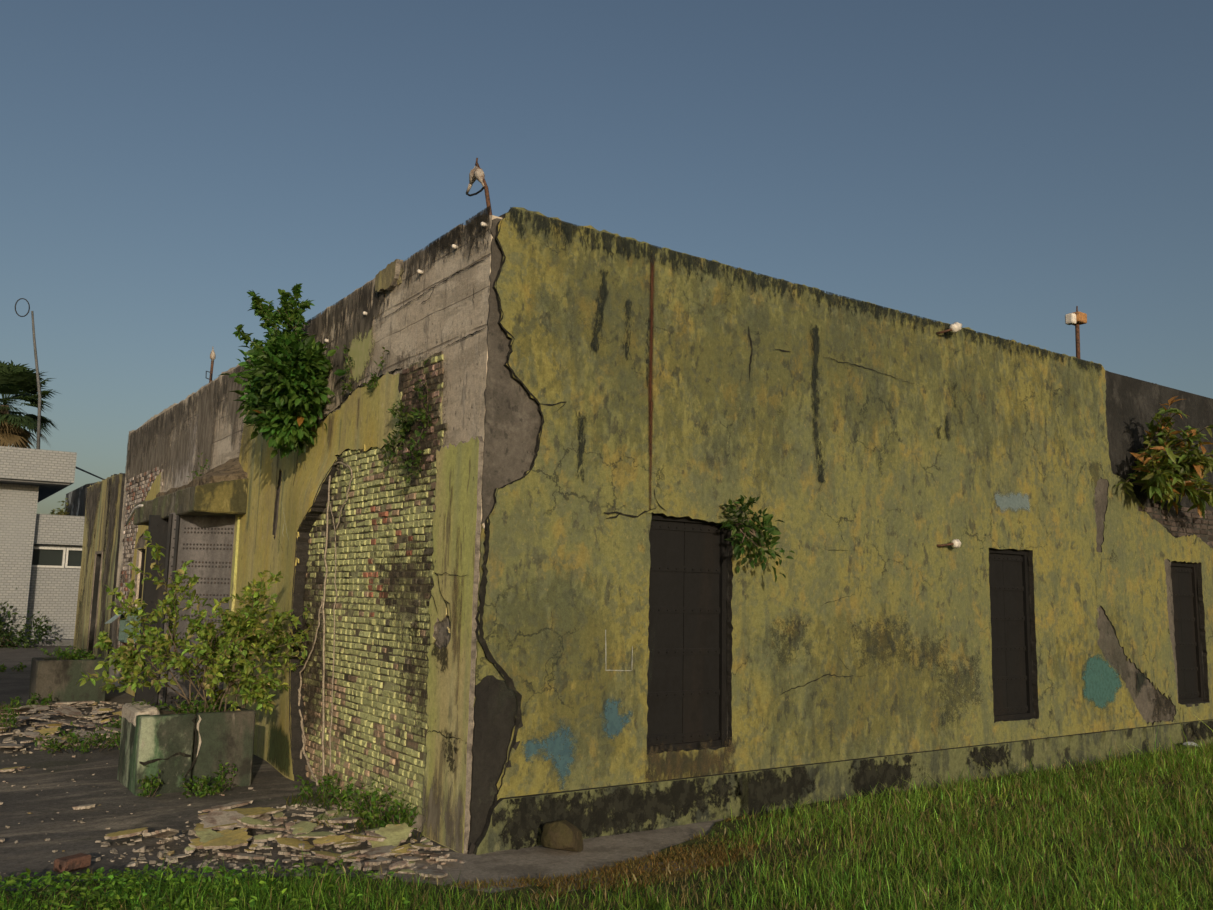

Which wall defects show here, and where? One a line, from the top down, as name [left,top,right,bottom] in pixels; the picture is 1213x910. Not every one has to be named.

spalling [0,416,199,754]
leakage [77,360,259,658]
spalling [91,351,451,879]
spalling [467,640,523,854]
spalling [477,213,546,612]
crack [604,489,665,519]
leakage [492,741,816,850]
leakage [849,755,923,797]
leakage [968,743,1013,773]
spalling [1097,557,1201,749]
spalling [1094,370,1213,552]
leakage [1186,721,1213,740]